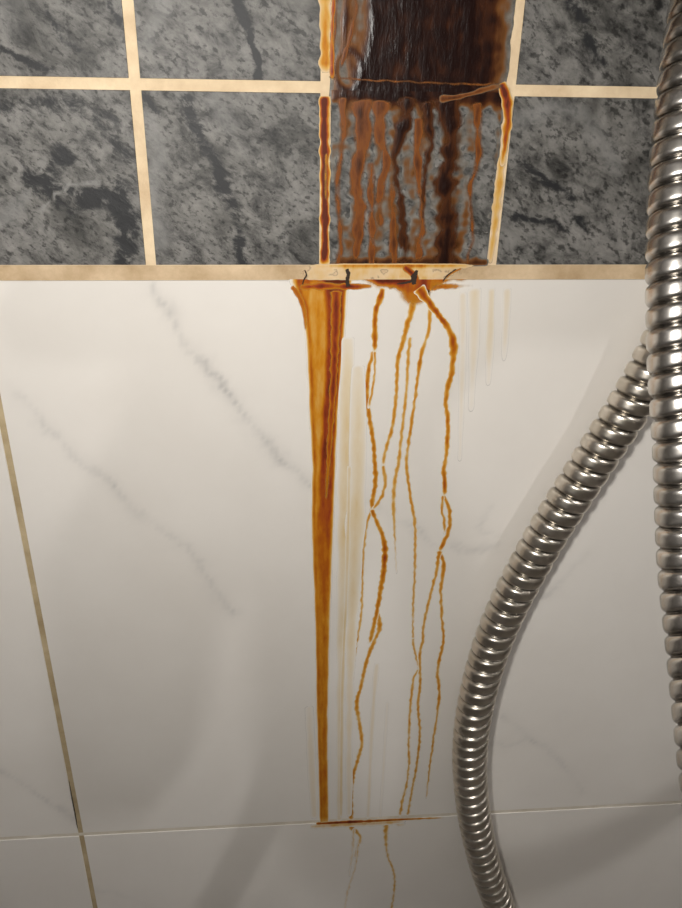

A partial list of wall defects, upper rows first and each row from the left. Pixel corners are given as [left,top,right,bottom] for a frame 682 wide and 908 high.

corrosion [290,0,516,908]